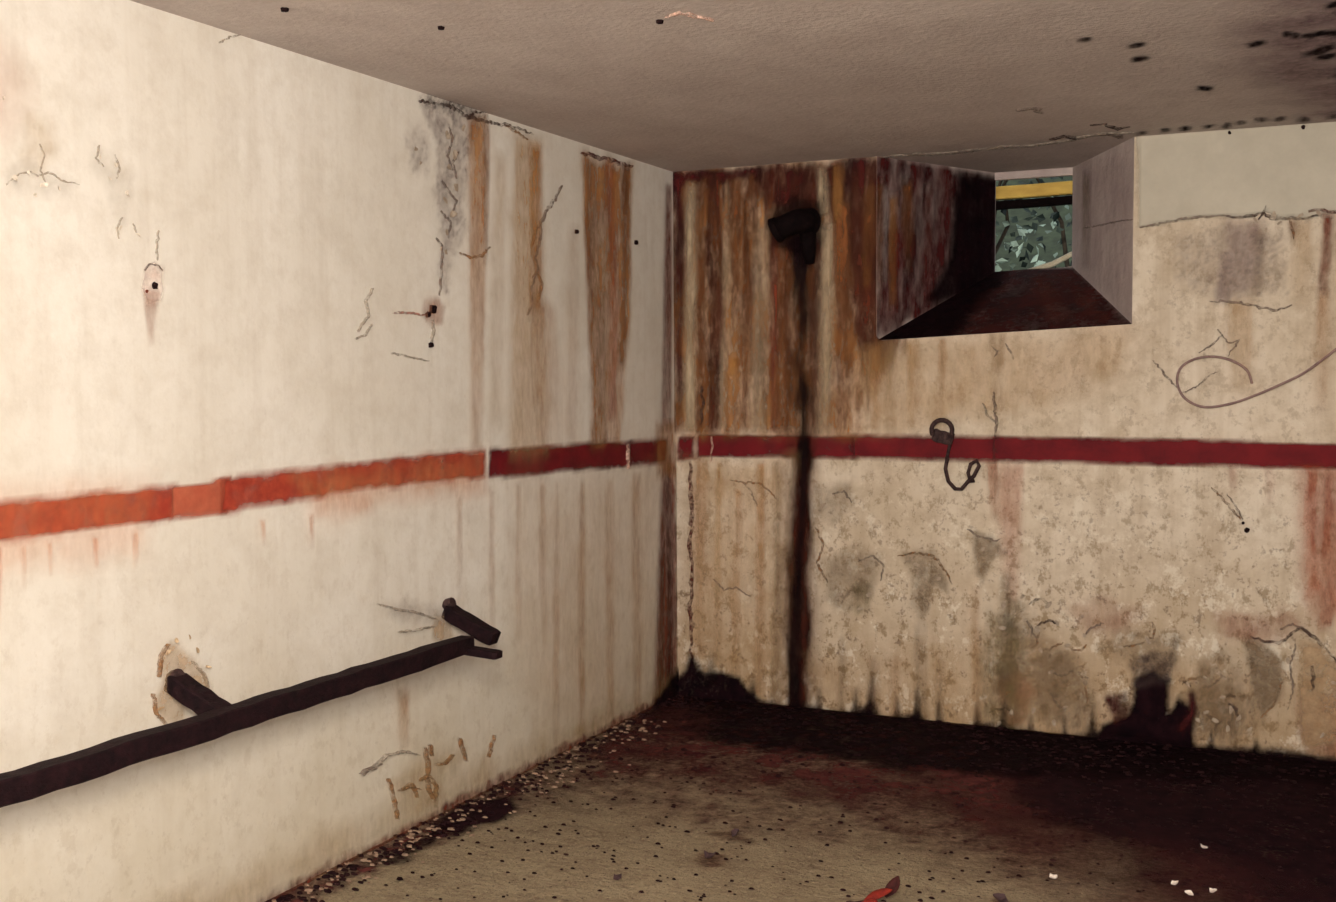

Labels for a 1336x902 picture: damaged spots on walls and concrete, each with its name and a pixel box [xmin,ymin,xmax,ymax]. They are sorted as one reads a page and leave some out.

water stain [1130,43,1148,62]
water stain [1250,2,1336,95]
water stain [429,101,466,296]
rust [459,122,489,264]
rust [580,152,633,443]
spalling [157,635,212,688]
spalling [151,693,172,724]